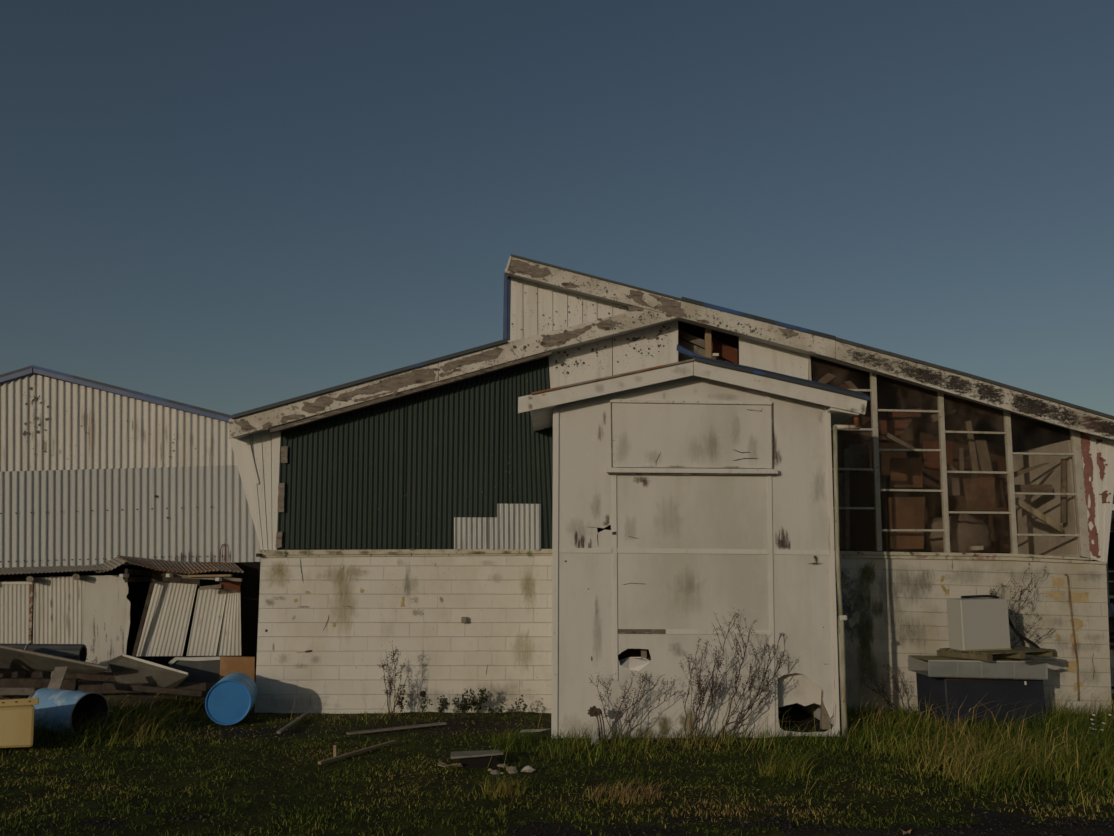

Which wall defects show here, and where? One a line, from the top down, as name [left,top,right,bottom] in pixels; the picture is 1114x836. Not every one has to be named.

peeling [627,290,688,318]
peeling [540,317,619,347]
peeling [1067,409,1111,558]